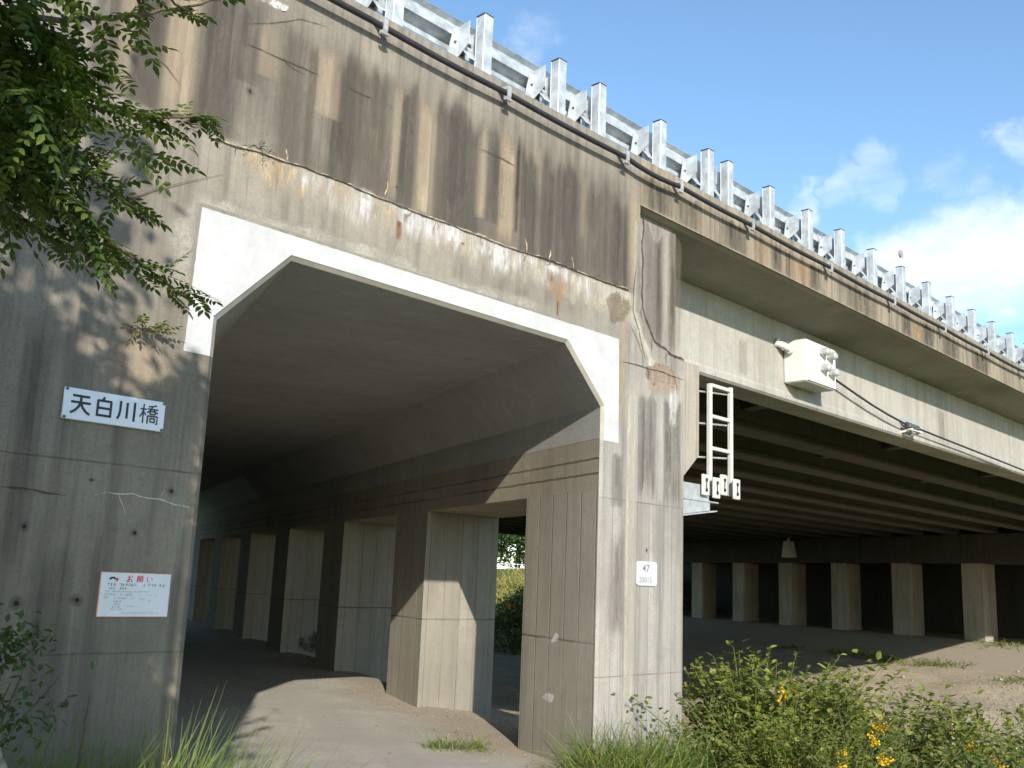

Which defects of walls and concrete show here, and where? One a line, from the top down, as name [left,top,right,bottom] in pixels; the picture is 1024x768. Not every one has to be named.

crack [210,137,684,386]
damp [657,236,679,344]
damp [774,247,790,276]
damp [247,57,656,727]
spalling [646,363,680,393]
crack [95,491,191,513]